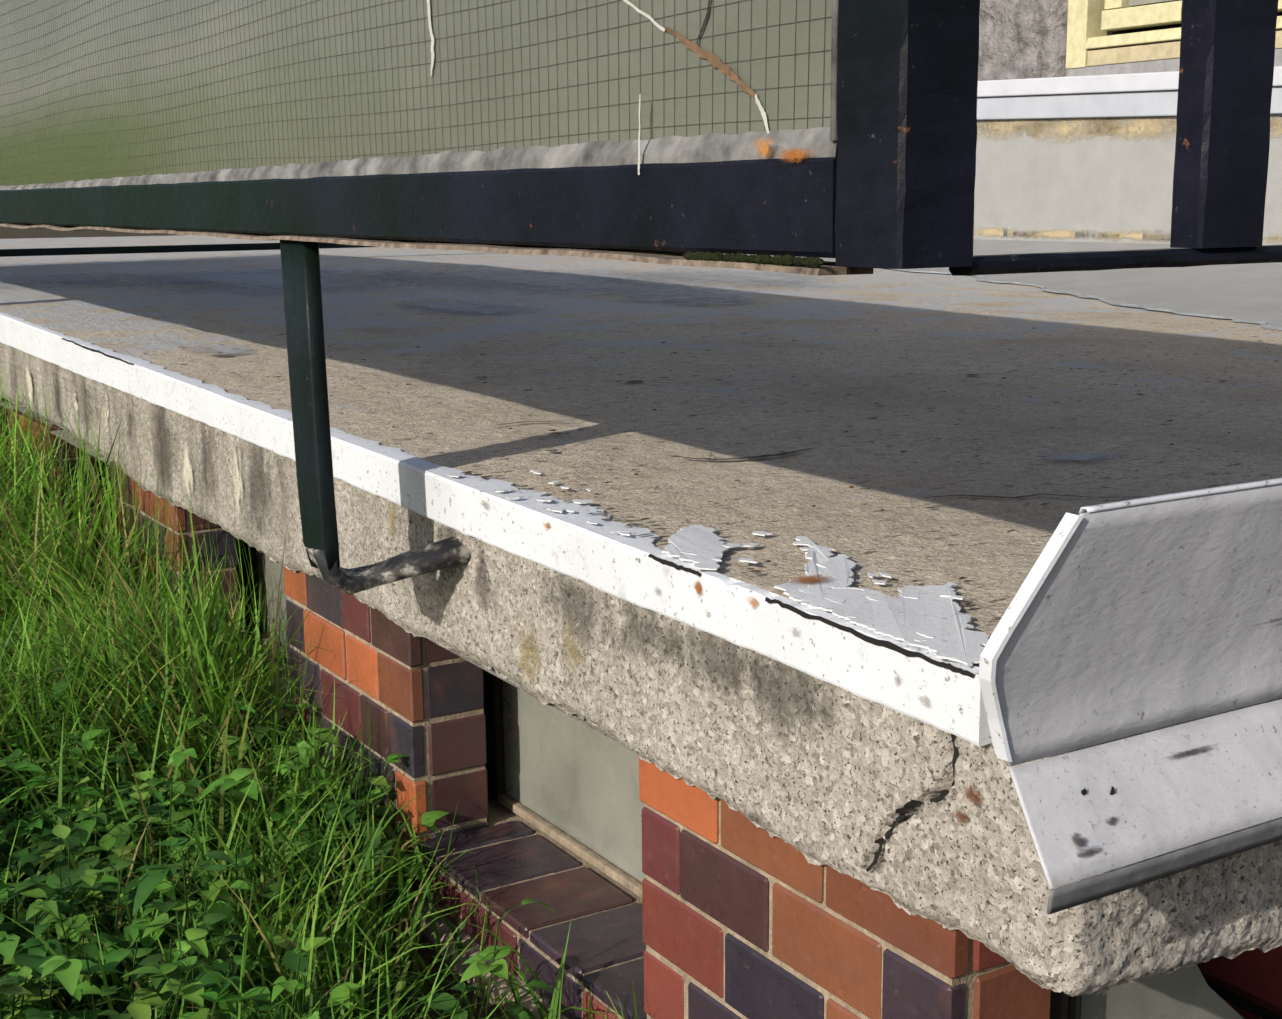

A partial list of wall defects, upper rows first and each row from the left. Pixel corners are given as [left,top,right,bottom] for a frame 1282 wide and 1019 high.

crack [623,0,769,134]
rust [756,139,808,160]
peeling [774,536,990,667]
crack [866,734,959,872]